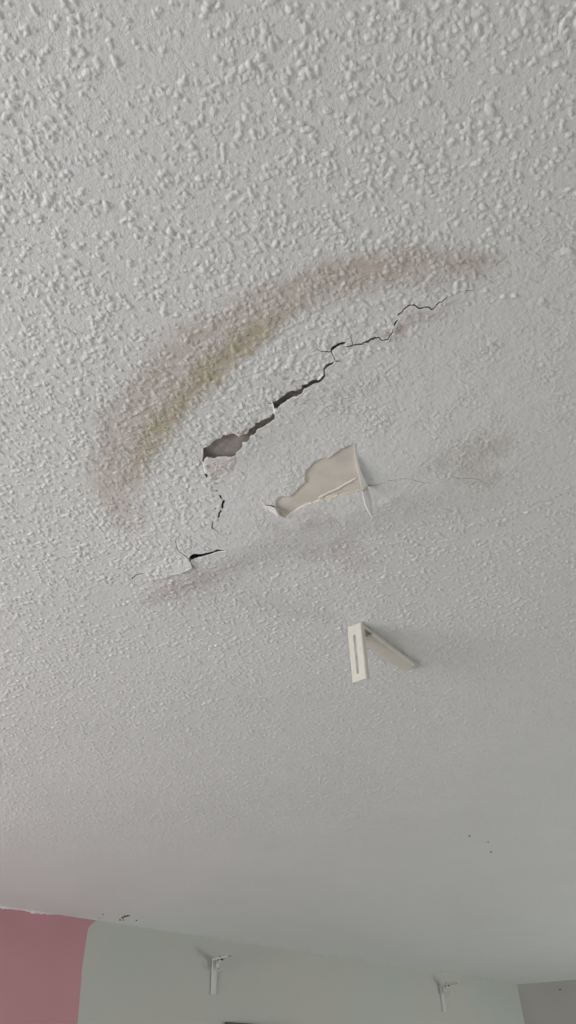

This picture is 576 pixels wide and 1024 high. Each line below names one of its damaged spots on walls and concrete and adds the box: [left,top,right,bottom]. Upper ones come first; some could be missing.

crack [268,290,472,409]
crack [131,474,226,587]
spalling [202,400,284,480]
peeling [264,443,373,518]